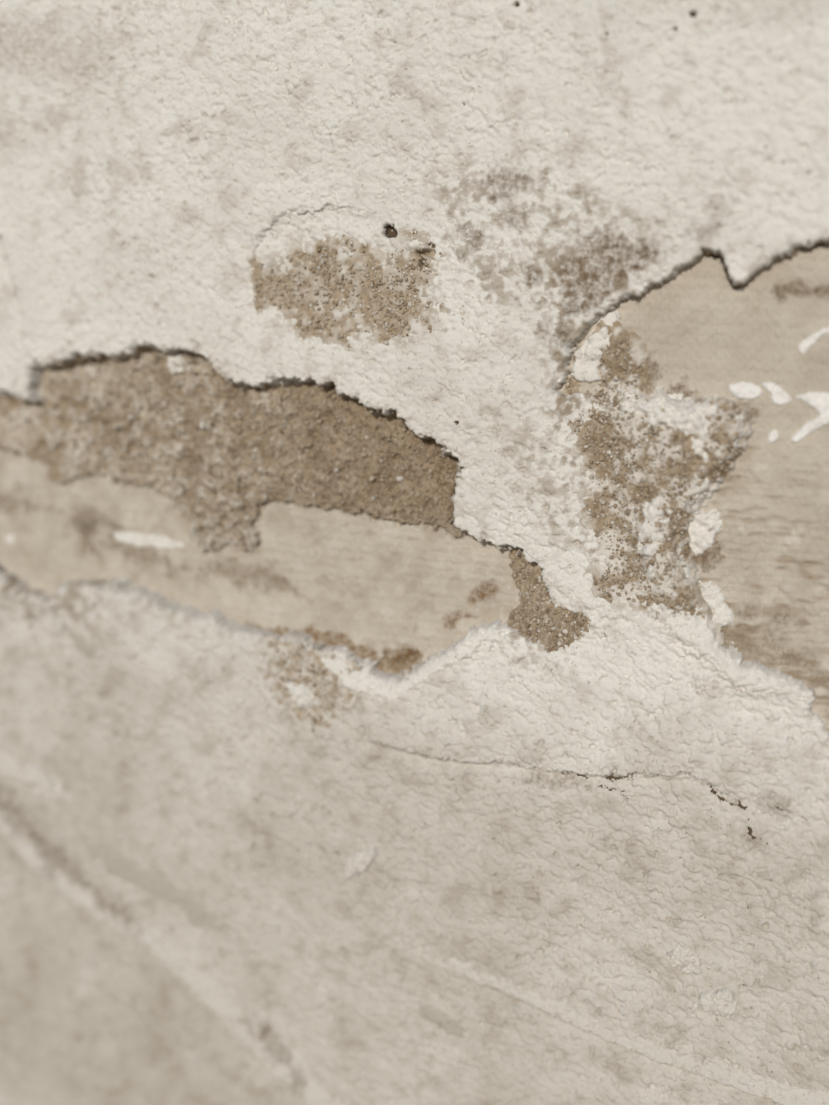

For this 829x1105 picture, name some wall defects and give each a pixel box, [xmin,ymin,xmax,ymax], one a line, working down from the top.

spalling [227,169,465,356]
spalling [0,349,591,732]
spalling [557,245,829,732]
crack [538,771,634,799]
crack [707,784,768,845]